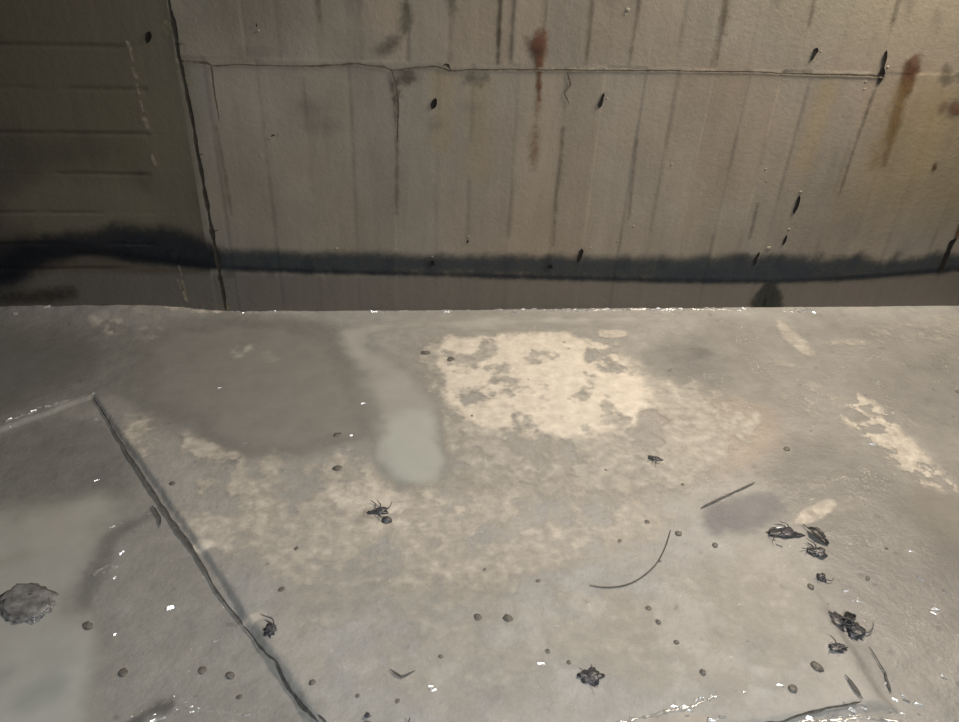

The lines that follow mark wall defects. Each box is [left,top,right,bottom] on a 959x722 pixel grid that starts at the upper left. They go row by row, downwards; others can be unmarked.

corrosion [530,31,547,101]
corrosion [888,55,920,144]
crack [165,0,886,310]
leakage [0,226,959,313]
leakage [776,320,812,356]
leakage [123,419,151,457]
leakage [180,330,762,694]
crack [701,482,755,508]
crack [94,399,326,722]
crack [389,669,414,678]
crack [768,674,863,722]
crack [869,647,892,693]